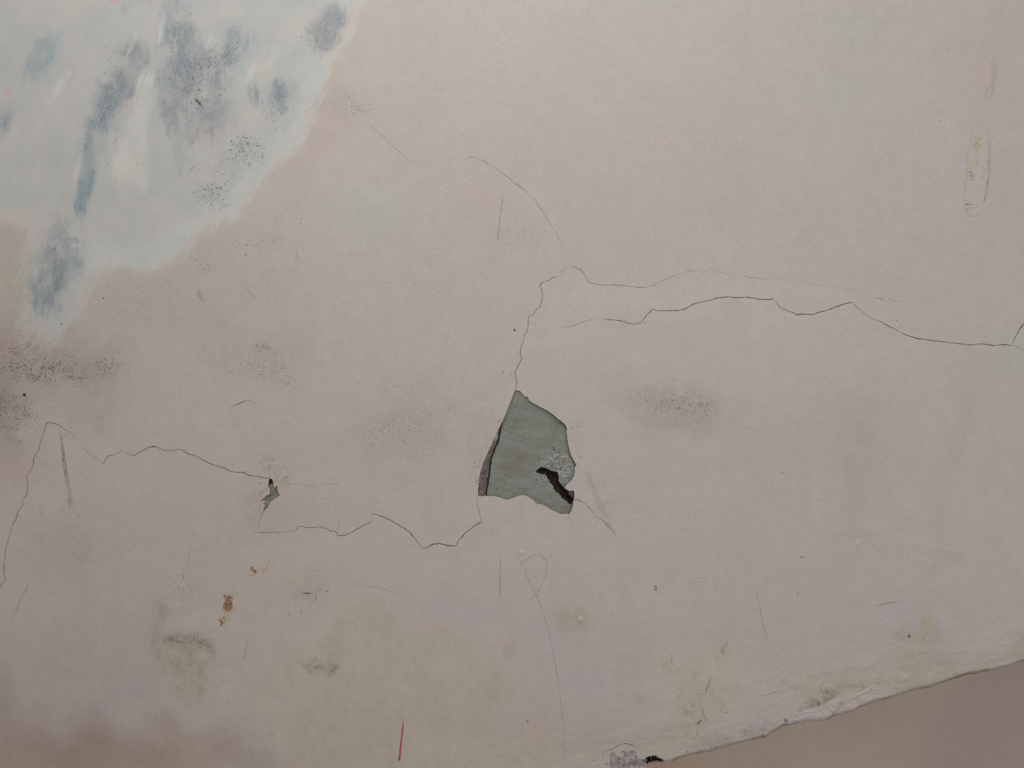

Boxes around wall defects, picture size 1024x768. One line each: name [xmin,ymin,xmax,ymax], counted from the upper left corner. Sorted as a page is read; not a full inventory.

crack [540,270,851,324]
flaking render [474,372,579,514]
flaking render [249,452,283,520]
crack [303,509,481,549]